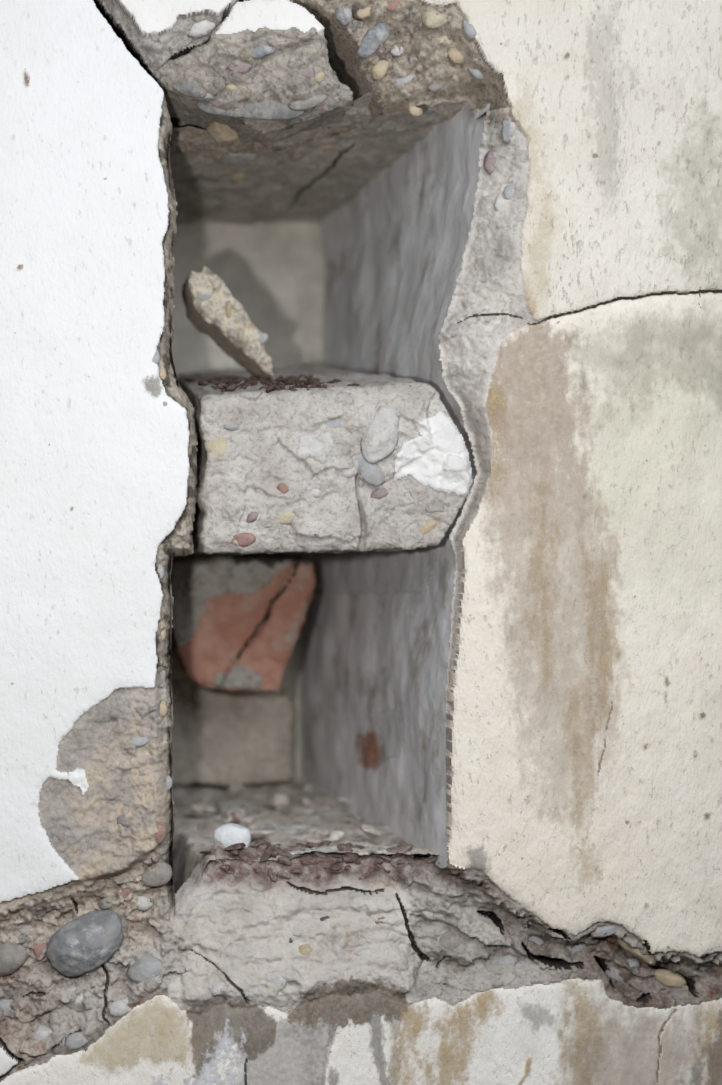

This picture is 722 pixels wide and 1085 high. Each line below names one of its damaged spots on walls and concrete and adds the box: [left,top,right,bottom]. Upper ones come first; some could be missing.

spalling [98,0,239,84]
crack [288,144,354,209]
crack [457,287,722,325]
spalling [290,0,547,813]
peeling [38,95,353,891]
crack [0,1037,25,1078]
crack [23,990,45,998]
crack [51,965,109,1051]
damp [83,976,409,1085]
spalling [0,844,722,1082]
crack [477,910,699,1084]